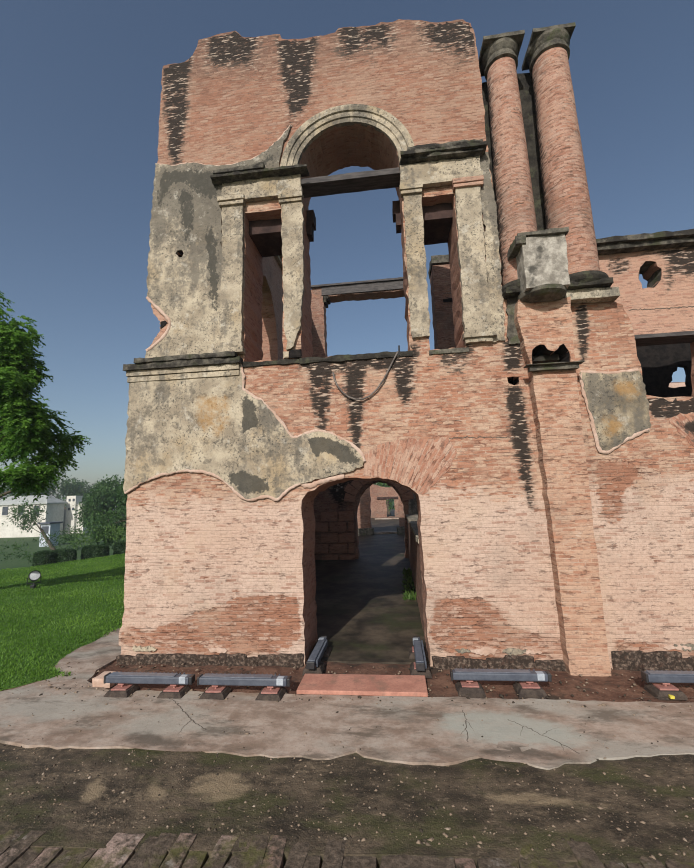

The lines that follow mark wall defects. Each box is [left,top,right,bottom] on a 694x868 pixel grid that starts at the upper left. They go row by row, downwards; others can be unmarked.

water stain [160,20,478,165]
flaking render [145,125,292,358]
flaking render [480,152,520,345]
water stain [604,246,694,296]
flaking render [123,364,366,501]
spalling [283,349,302,359]
water stain [292,339,483,452]
water stain [498,337,538,514]
spalling [532,344,570,364]
water stain [572,303,592,367]
flaking render [579,368,651,454]
water stain [648,397,694,446]